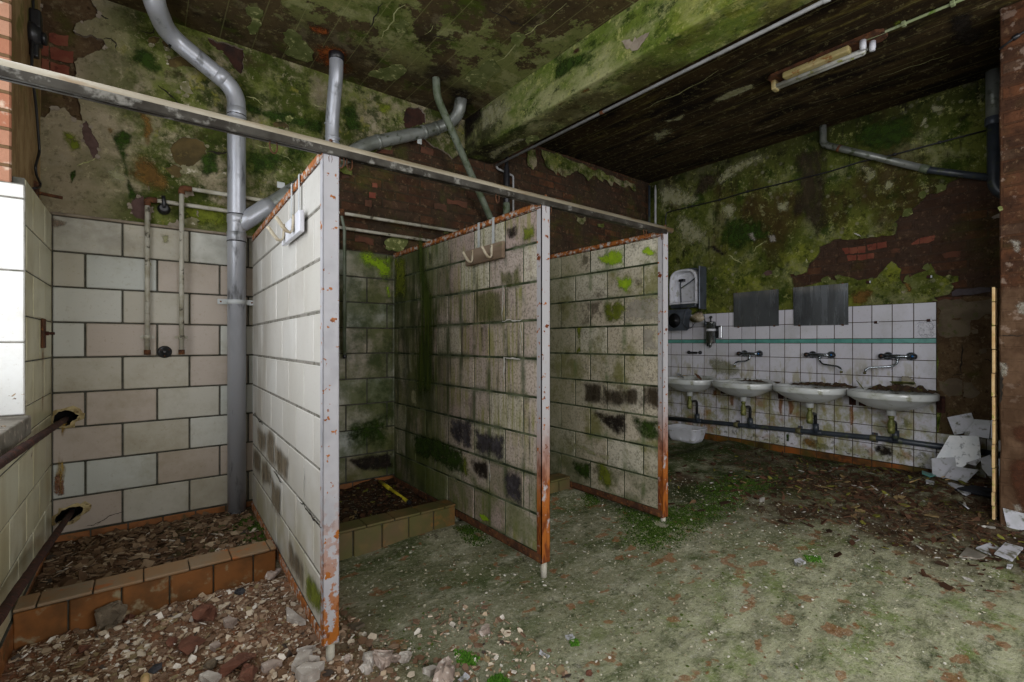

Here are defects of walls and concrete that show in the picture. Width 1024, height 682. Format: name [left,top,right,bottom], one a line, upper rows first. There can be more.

flaking render [40,0,108,77]
flaking render [41,90,101,159]
flaking render [168,135,209,176]
leakage [424,63,481,139]
flaking render [525,135,636,191]
leakage [654,115,683,140]
leakage [715,85,753,101]
flaking render [762,178,1003,440]
spalling [51,406,85,428]
leakage [585,384,658,434]
leakage [450,419,504,479]
leakage [505,472,521,505]